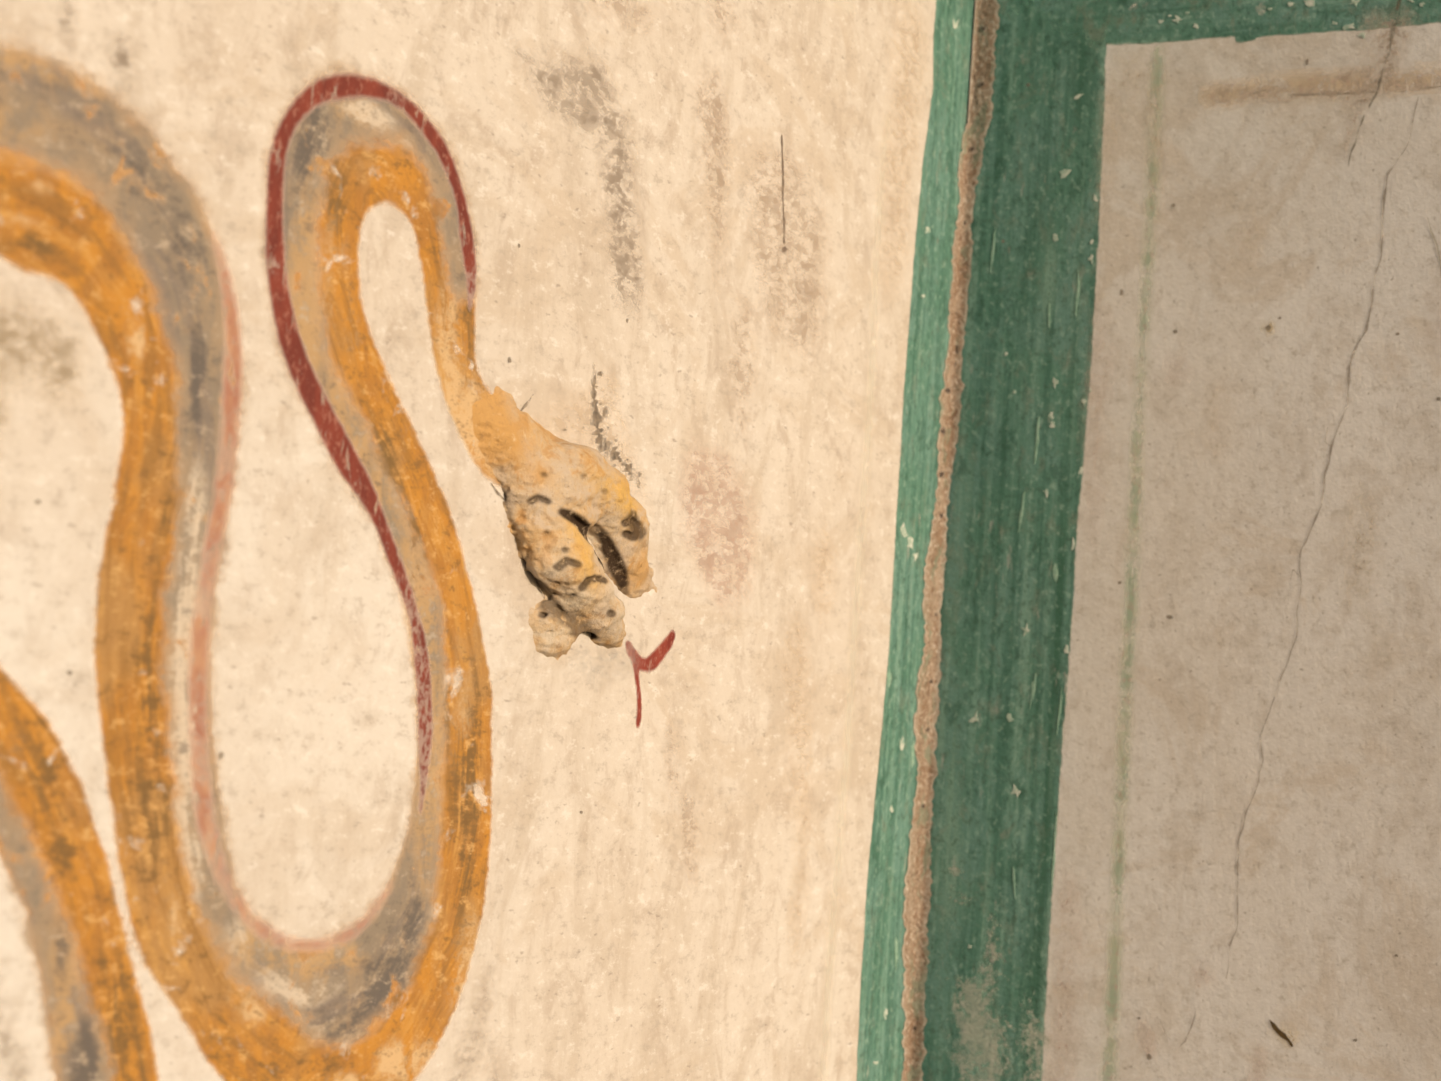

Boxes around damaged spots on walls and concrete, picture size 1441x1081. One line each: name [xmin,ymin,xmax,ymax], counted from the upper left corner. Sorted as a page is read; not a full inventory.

crack [1348,0,1402,167]
crack [1226,97,1419,979]